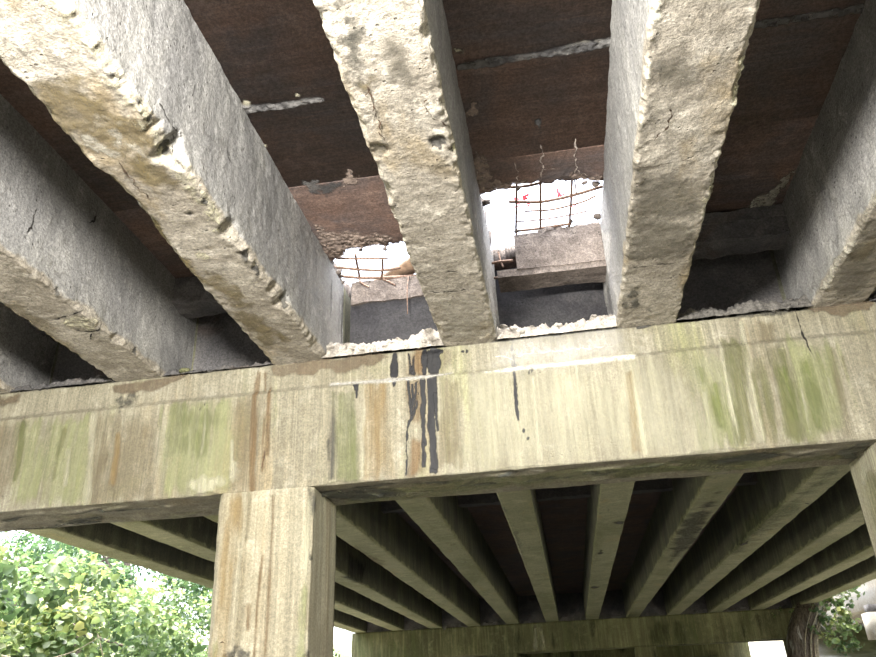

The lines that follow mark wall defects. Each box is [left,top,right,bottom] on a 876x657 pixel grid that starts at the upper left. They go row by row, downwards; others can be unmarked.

crack [362,82,387,141]
spalling [473,152,603,235]
spalling [315,225,416,314]
crack [795,311,811,352]
damp [272,348,443,476]
damp [506,344,519,420]